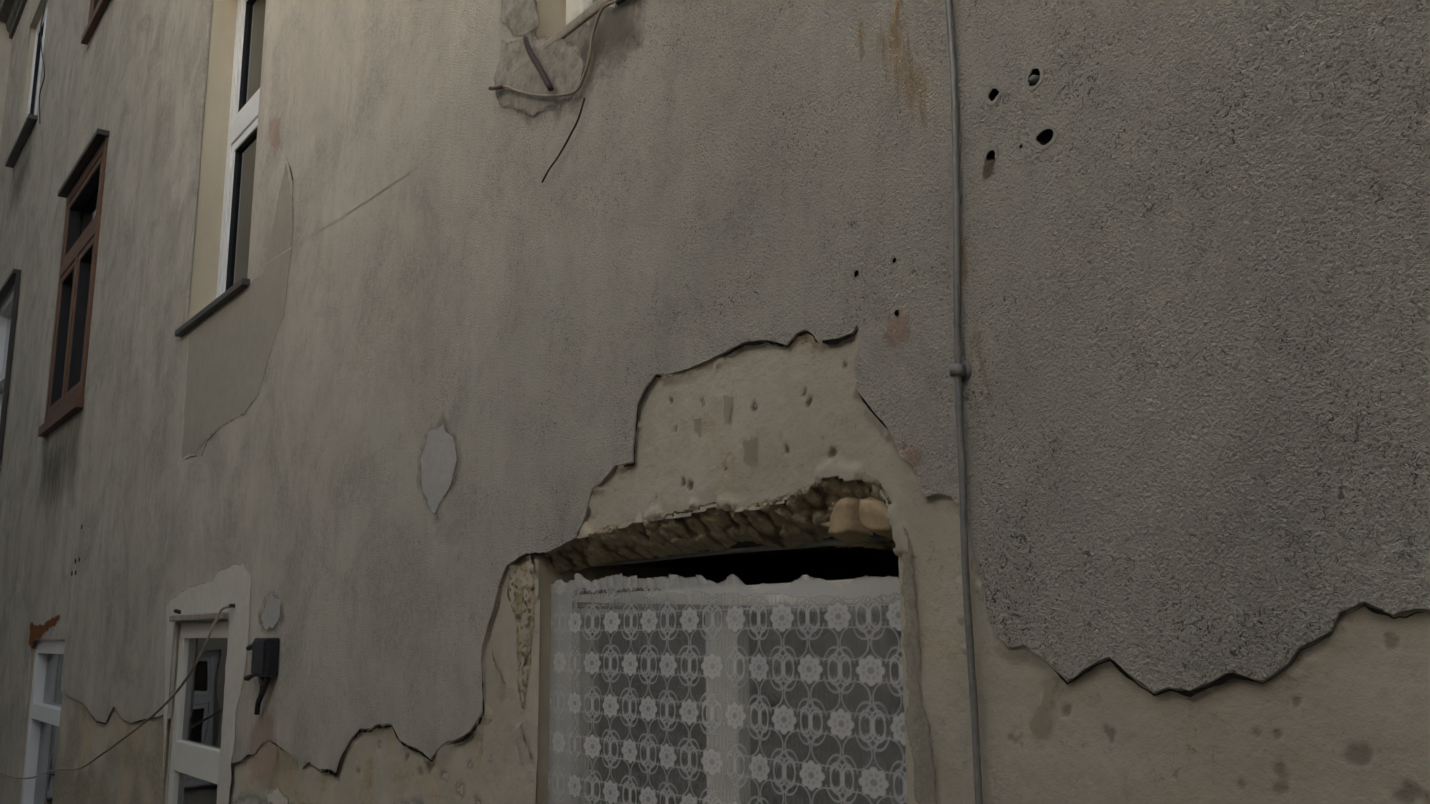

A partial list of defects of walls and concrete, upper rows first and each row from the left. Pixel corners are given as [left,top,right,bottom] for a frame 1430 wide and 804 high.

spalling [230,330,1430,804]